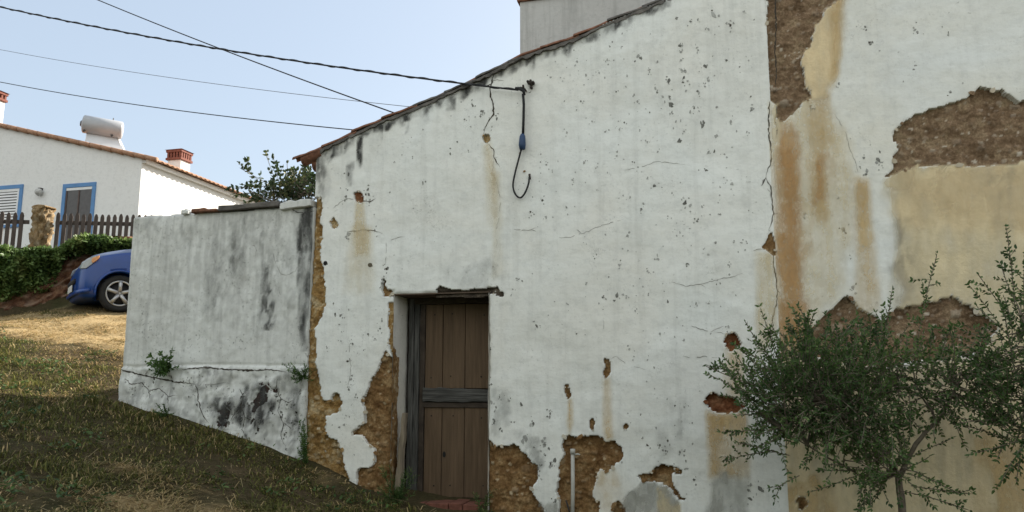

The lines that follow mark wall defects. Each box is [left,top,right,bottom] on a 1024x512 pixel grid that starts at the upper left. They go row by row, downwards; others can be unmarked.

spalling [742,0,842,122]
crack [761,0,778,226]
water stain [297,207,313,254]
spalling [762,230,777,256]
peeling [777,82,1024,512]
spalling [125,197,403,497]
spalling [724,325,741,351]
crack [121,366,291,445]
water stain [214,386,276,427]
spalling [489,377,626,512]
spalling [638,425,710,500]
spalling [699,391,745,422]